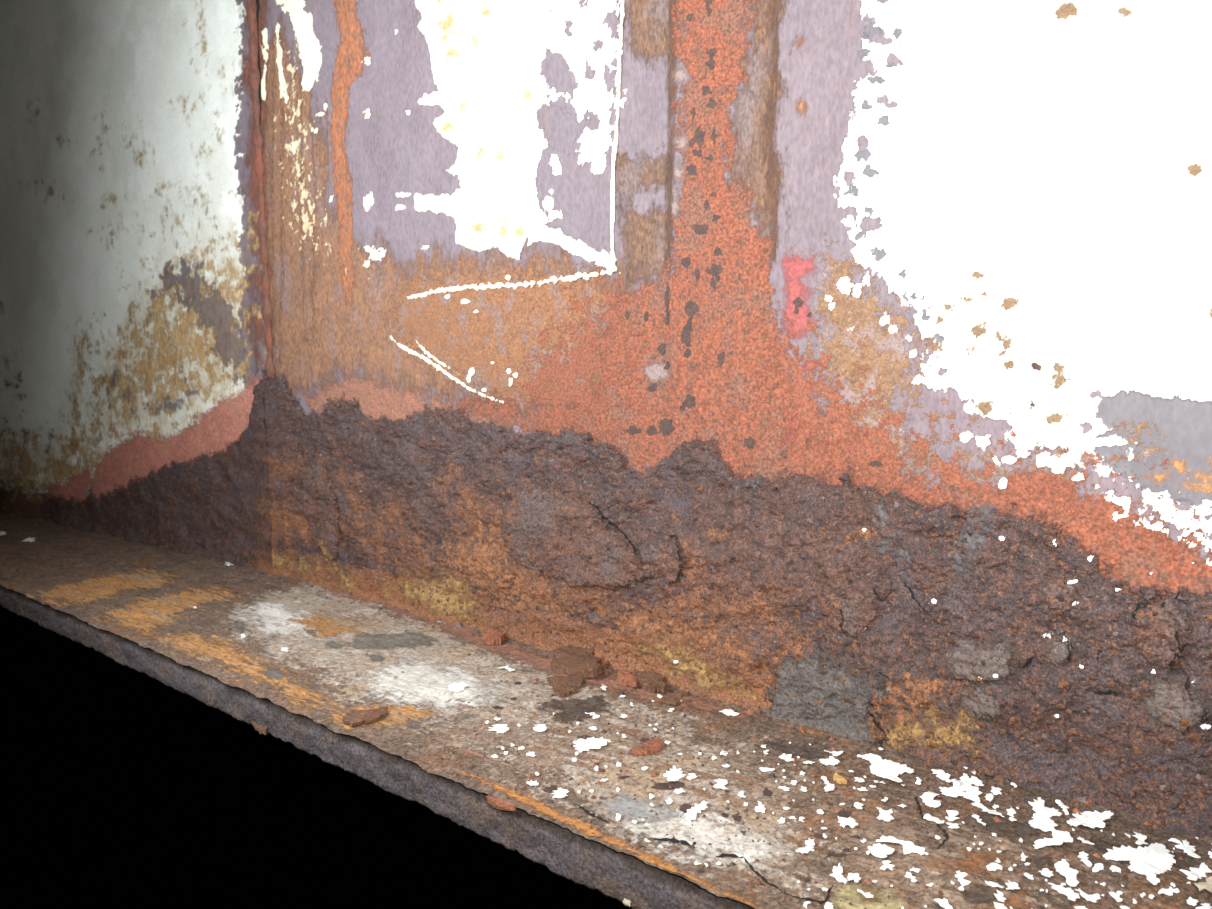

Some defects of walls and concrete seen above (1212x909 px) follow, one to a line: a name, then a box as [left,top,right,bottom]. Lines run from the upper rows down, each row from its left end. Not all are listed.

peeling [107,370,198,414]
corrosion [0,0,679,520]
corrosion [25,232,1212,909]
peeling [147,0,1212,576]
corrosion [724,0,803,267]